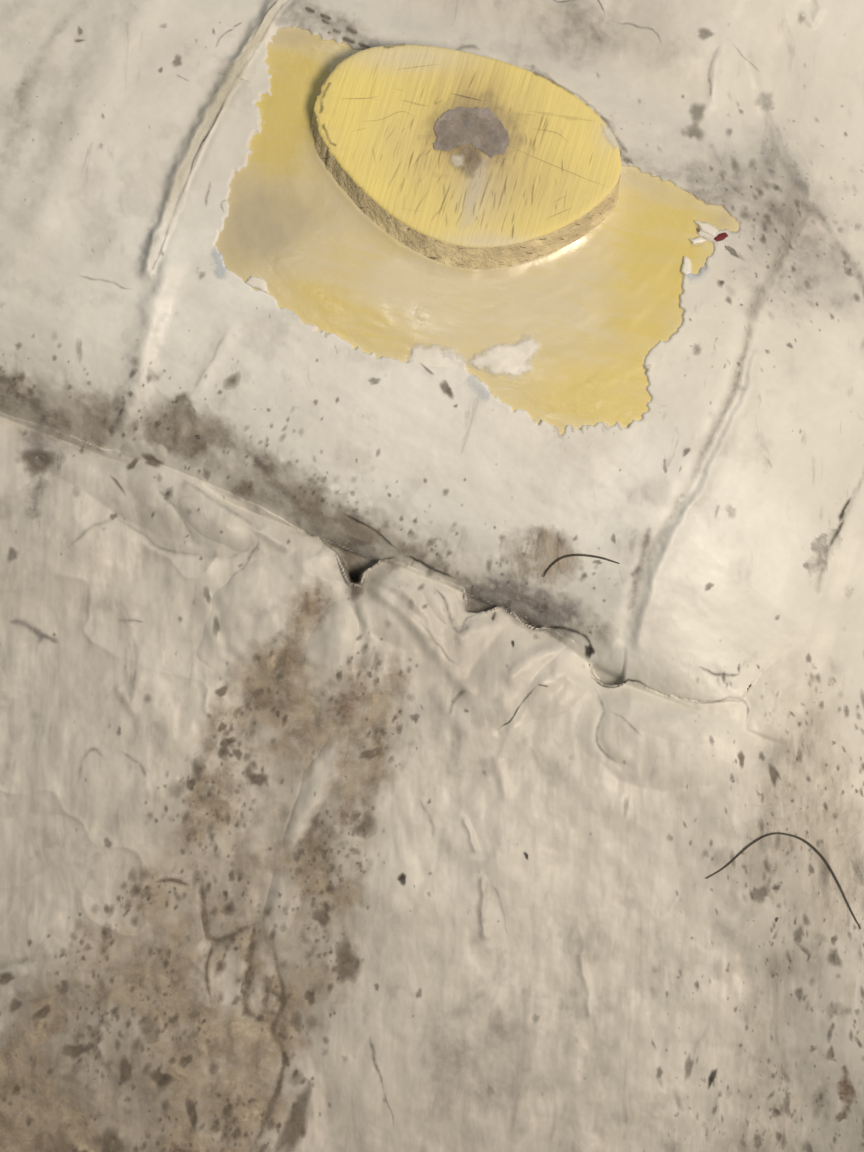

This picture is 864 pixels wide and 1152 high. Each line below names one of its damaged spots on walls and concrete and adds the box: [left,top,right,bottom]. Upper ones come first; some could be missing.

peeling [213,7,740,437]
damp [0,377,120,470]
damp [147,395,235,458]
damp [233,456,382,581]
damp [466,528,579,631]
damp [184,775,236,844]
damp [230,593,404,912]
damp [0,988,103,1152]
damp [93,920,330,1152]